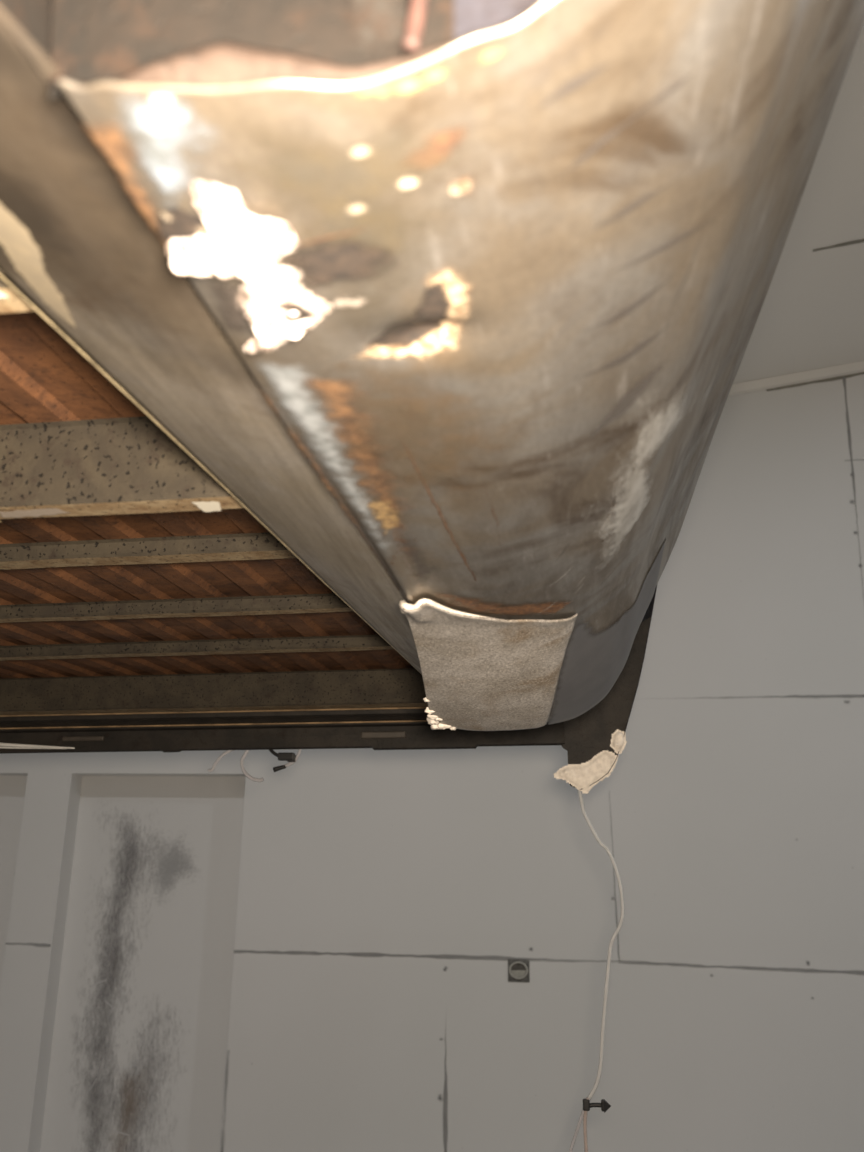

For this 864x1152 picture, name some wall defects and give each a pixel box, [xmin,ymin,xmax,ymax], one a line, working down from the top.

peeling [0,203,76,328]
peeling [166,181,333,353]